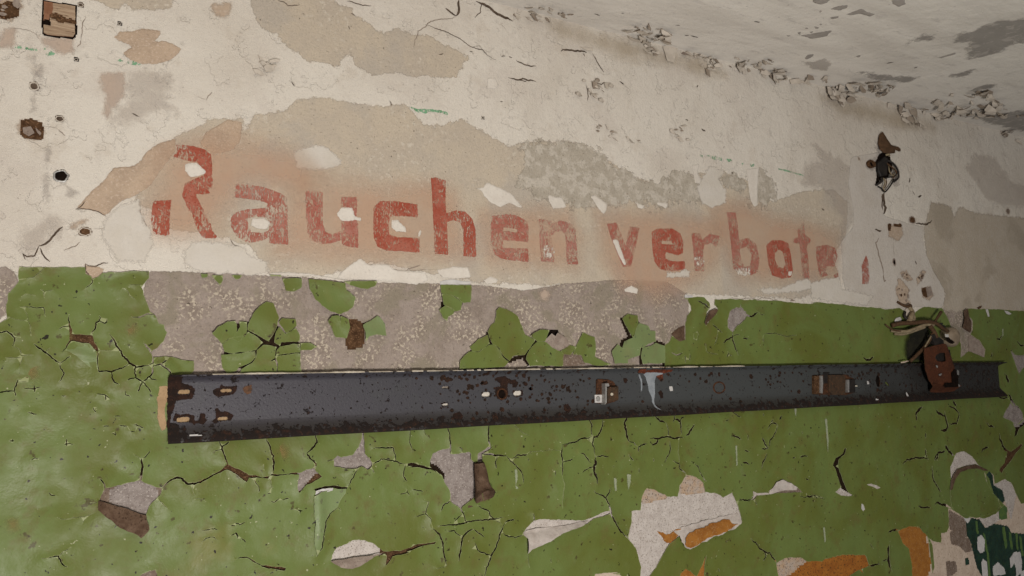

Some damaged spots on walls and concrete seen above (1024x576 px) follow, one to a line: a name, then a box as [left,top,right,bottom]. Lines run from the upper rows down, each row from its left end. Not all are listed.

crack [414,0,536,102]
crack [0,202,104,415]
peeling [78,97,848,430]
peeling [896,202,1024,357]
crack [93,316,153,476]
rust [167,376,252,428]
rust [415,371,595,424]
rust [623,367,728,398]
peeling [520,507,612,553]
crack [488,416,703,536]
peeling [625,471,742,576]
peeling [896,401,1024,576]